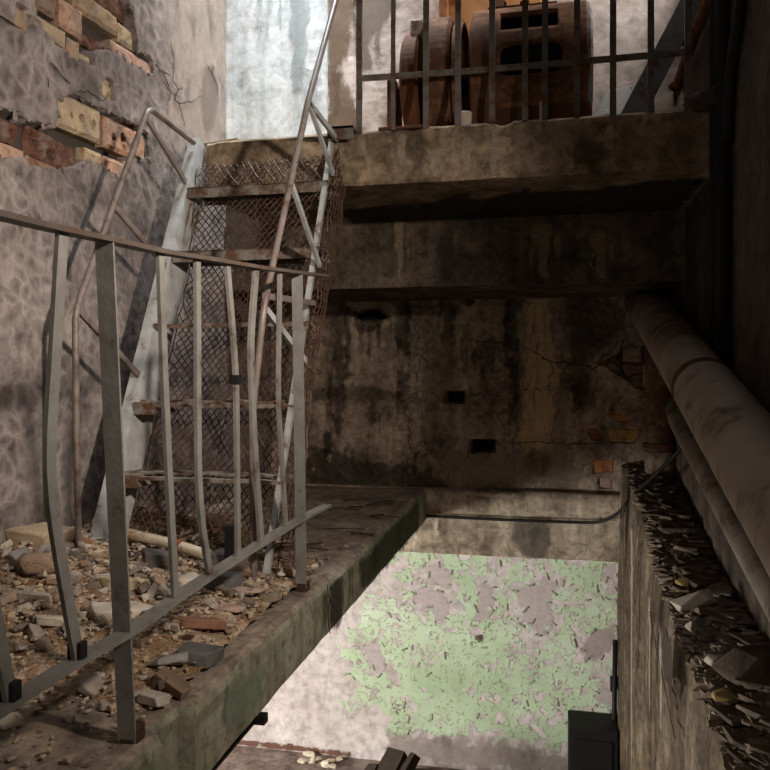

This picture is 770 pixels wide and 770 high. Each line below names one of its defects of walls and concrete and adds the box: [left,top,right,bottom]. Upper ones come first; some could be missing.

spalling [0,80,151,178]
spalling [14,0,156,76]
crack [155,45,219,126]
leakage [305,298,584,490]
crack [466,312,640,404]
peeling [333,551,618,752]